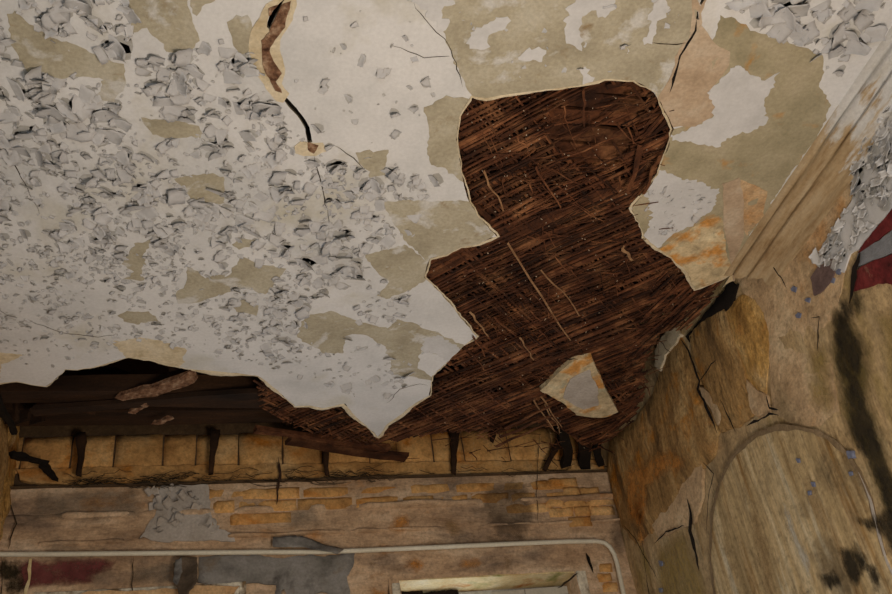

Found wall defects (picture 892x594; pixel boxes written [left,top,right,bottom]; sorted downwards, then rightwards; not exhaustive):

crack [394,4,462,83]
crack [656,0,706,91]
peeling [232,122,267,165]
crack [249,0,365,219]
peeling [428,173,444,187]
peeling [0,171,39,288]
crack [681,340,779,432]
leakage [814,296,892,550]
peeling [139,483,450,543]
peeling [272,535,343,554]
crack [623,466,714,593]
leakage [821,545,879,590]